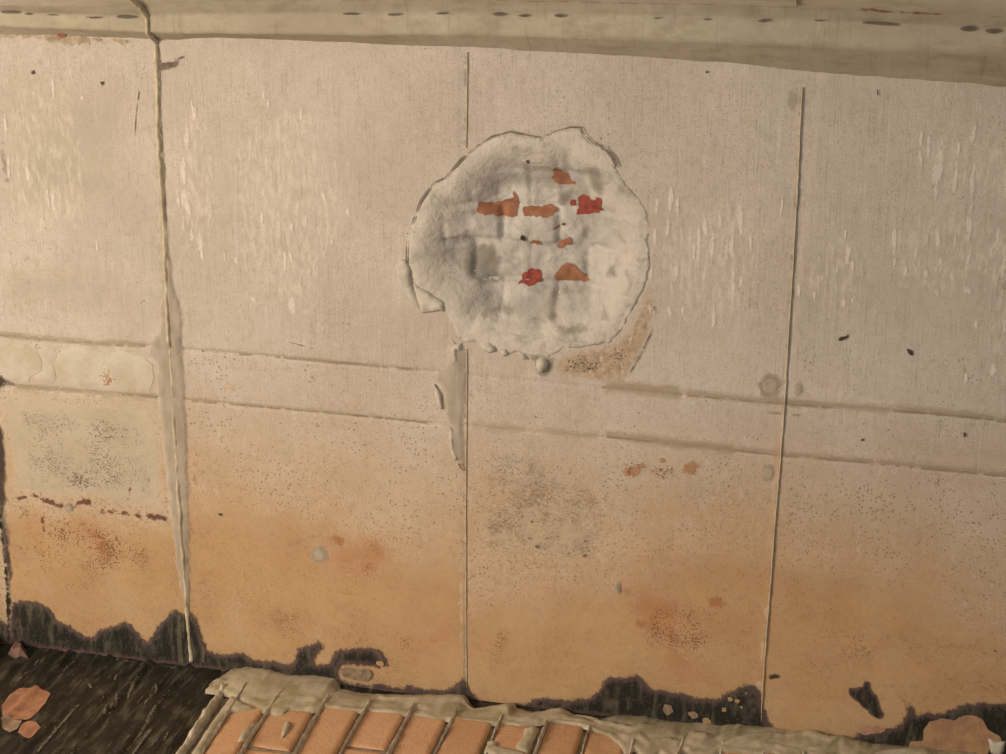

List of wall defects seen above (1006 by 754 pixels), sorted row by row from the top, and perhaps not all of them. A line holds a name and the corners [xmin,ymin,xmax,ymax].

spalling [395,126,652,380]
leakage [229,404,426,423]
leakage [547,430,799,458]
rust [623,458,699,480]
leakage [813,457,1006,477]
leakage [0,376,166,643]
rust [7,504,1006,739]